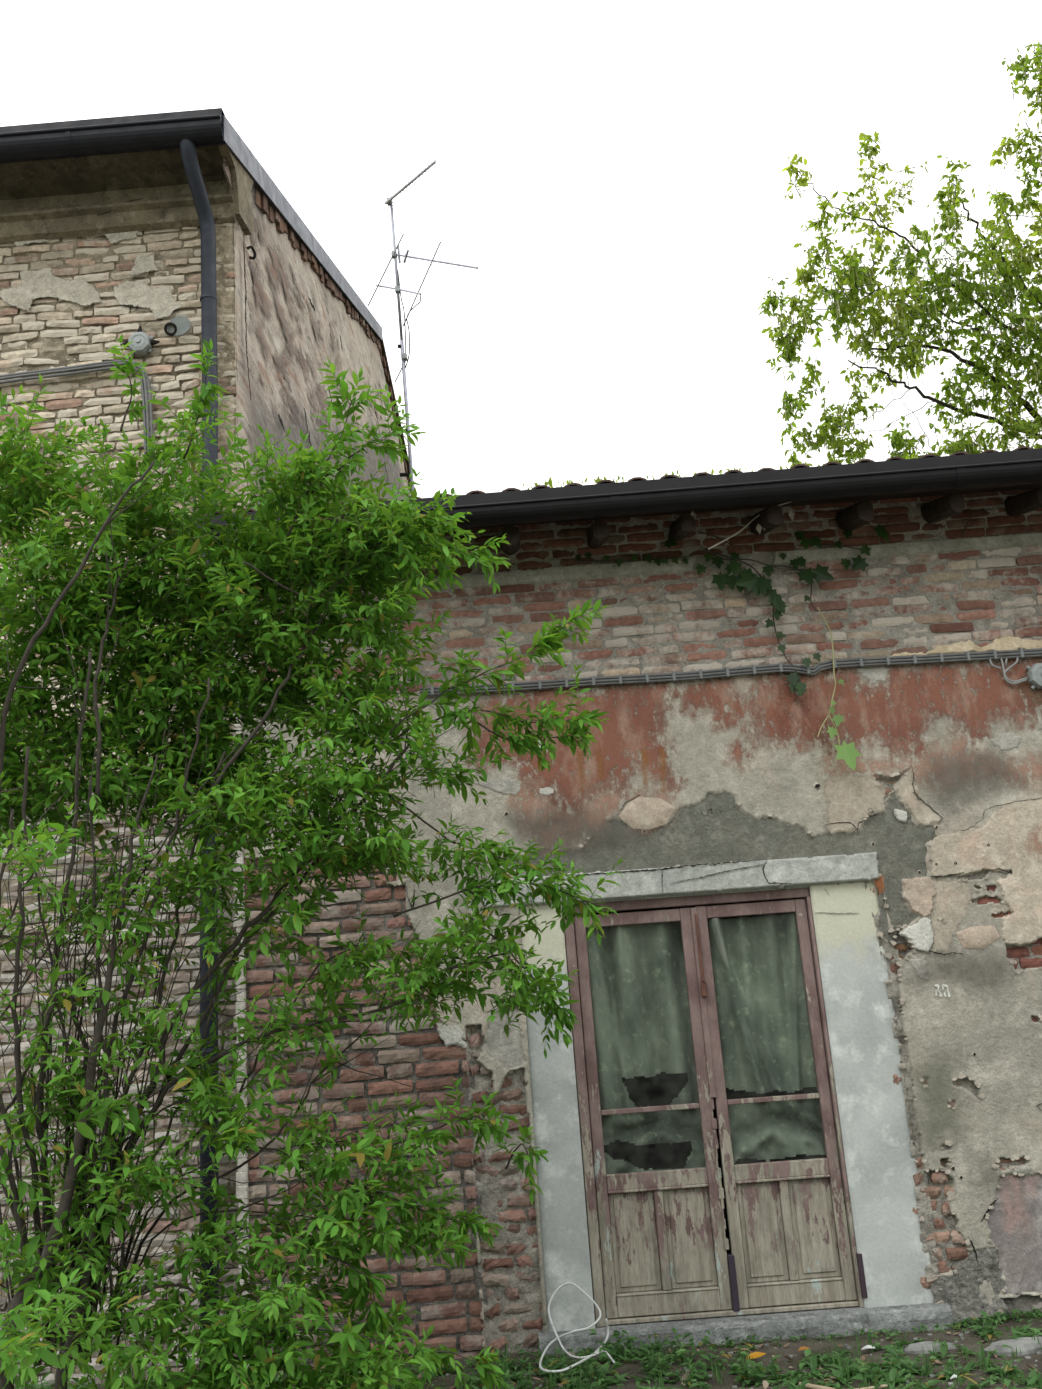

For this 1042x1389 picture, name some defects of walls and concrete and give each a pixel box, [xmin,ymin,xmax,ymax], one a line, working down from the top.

flaking render [386,868,407,887]
peeling [467,635,1042,1324]
peeling [437,1009,525,1073]